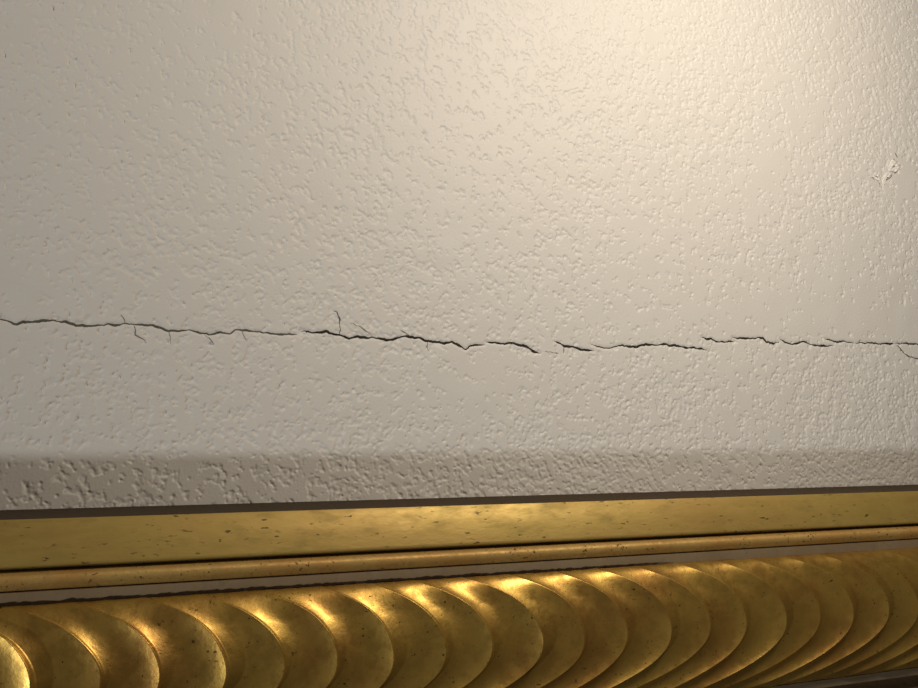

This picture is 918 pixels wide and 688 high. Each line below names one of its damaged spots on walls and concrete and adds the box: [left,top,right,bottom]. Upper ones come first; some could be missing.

crack [0,311,918,359]